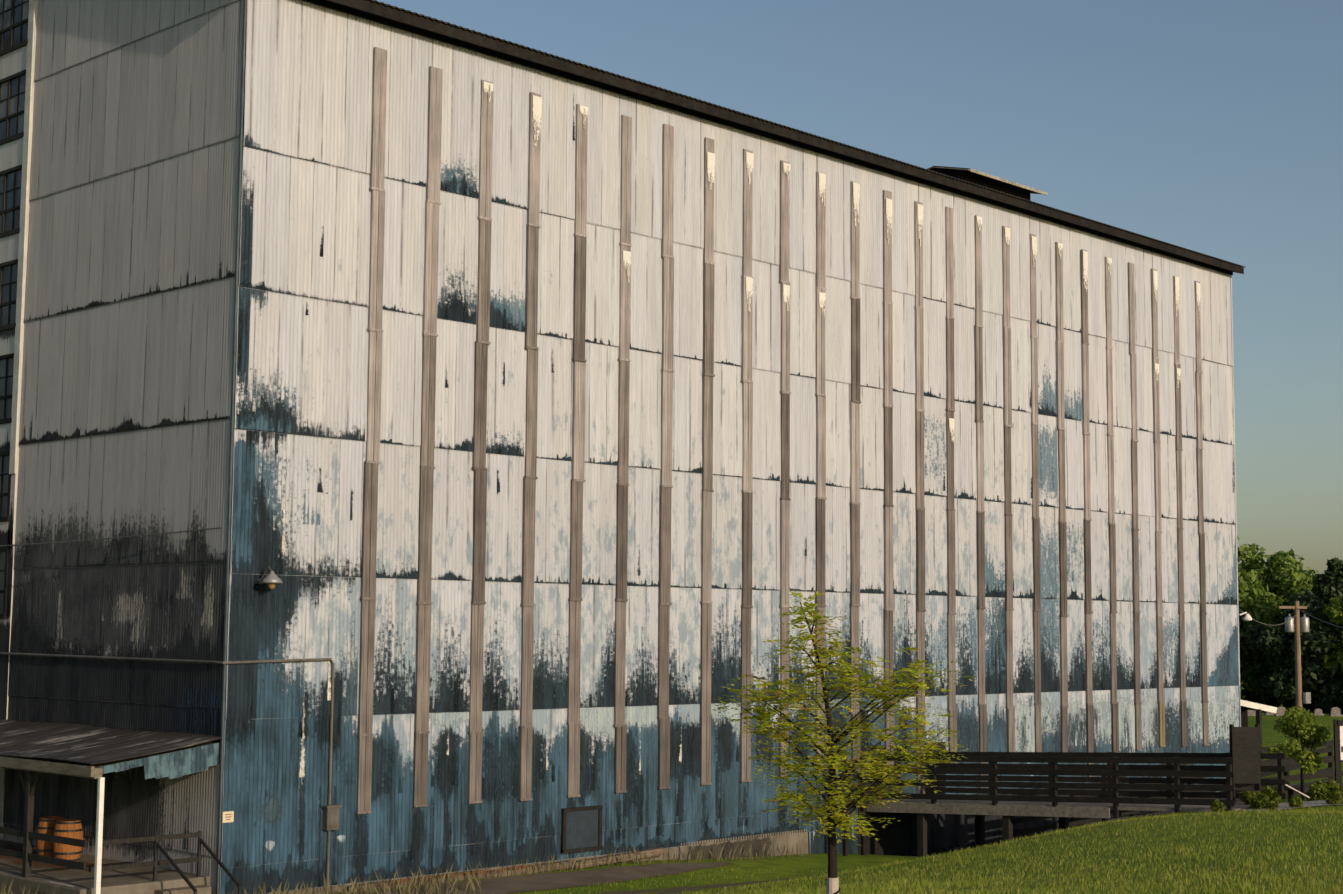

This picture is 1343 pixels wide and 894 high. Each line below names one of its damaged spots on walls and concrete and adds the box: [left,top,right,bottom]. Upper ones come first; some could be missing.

damp [384,164,528,210]
damp [29,263,611,346]
damp [0,328,15,345]
damp [630,344,741,366]
damp [0,369,414,459]
damp [860,384,1234,445]
damp [434,433,1103,512]
damp [1161,514,1235,525]
damp [1188,589,1237,605]
damp [0,474,1201,894]